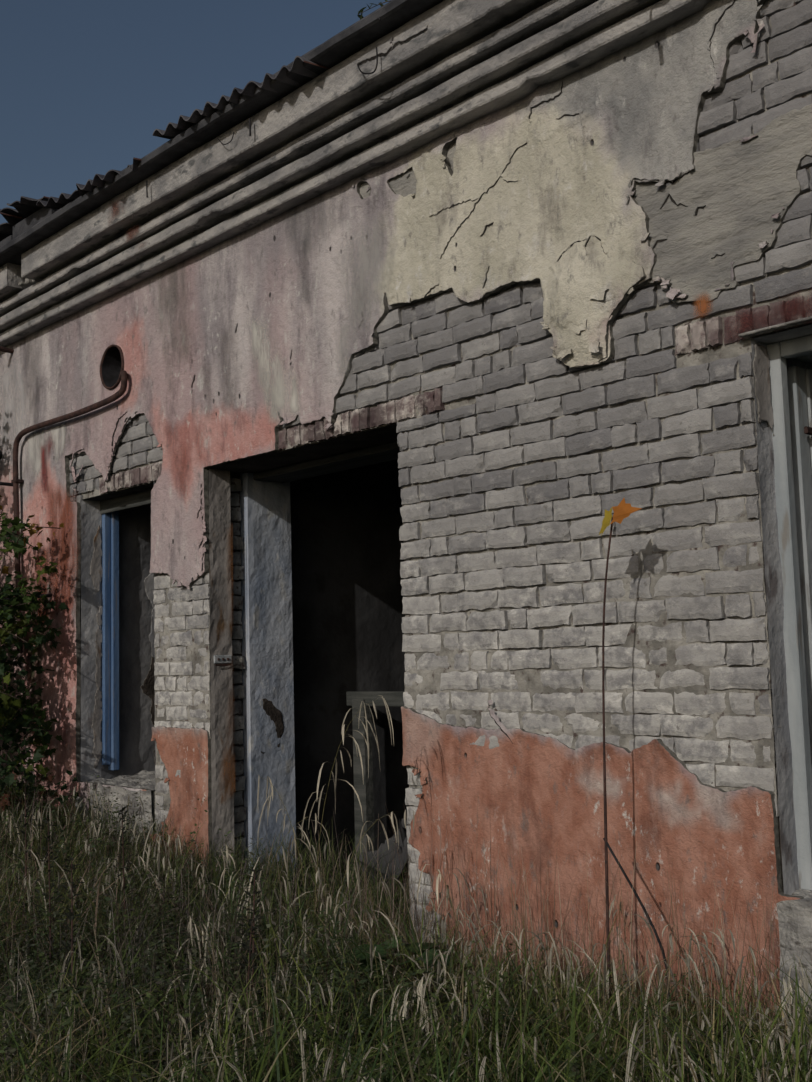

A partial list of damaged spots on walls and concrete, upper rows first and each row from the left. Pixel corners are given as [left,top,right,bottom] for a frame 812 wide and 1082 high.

crack [423,81,587,298]
spalling [69,414,163,520]
spalling [277,0,812,817]
spalling [141,573,219,834]